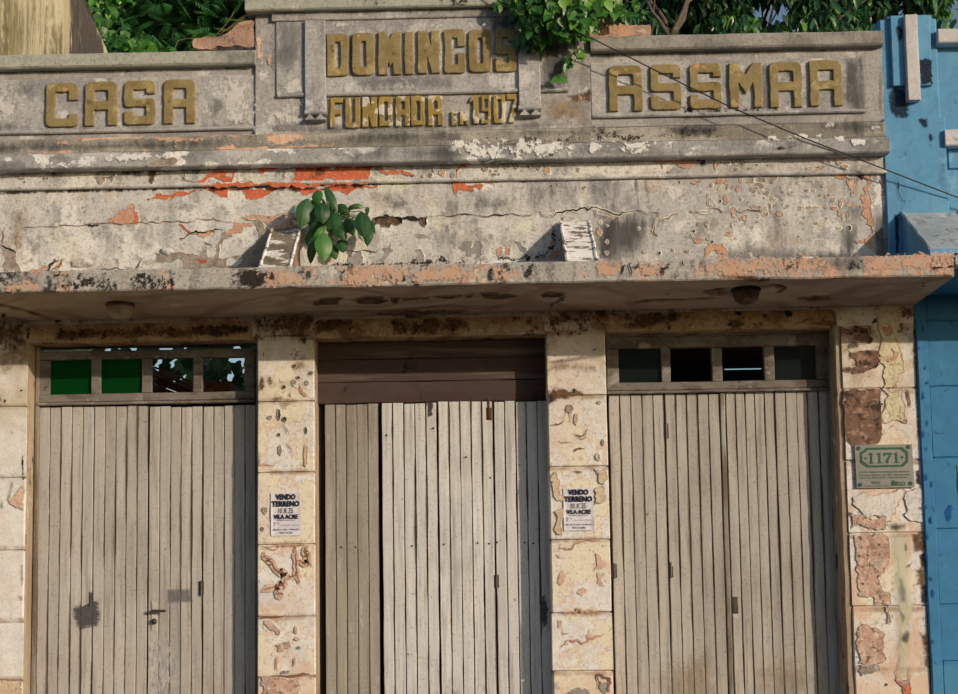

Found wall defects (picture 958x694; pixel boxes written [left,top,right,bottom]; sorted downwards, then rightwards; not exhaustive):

water stain [70,0,103,54]
crack [2,217,250,247]
peeling [42,133,955,278]
crack [427,205,768,236]
water stain [601,219,645,258]
crack [45,258,73,271]
water stain [56,306,609,344]
spalling [842,305,928,447]
water stain [546,388,583,404]
spalling [849,474,933,676]
spalling [566,674,611,694]
spalling [886,680,912,694]